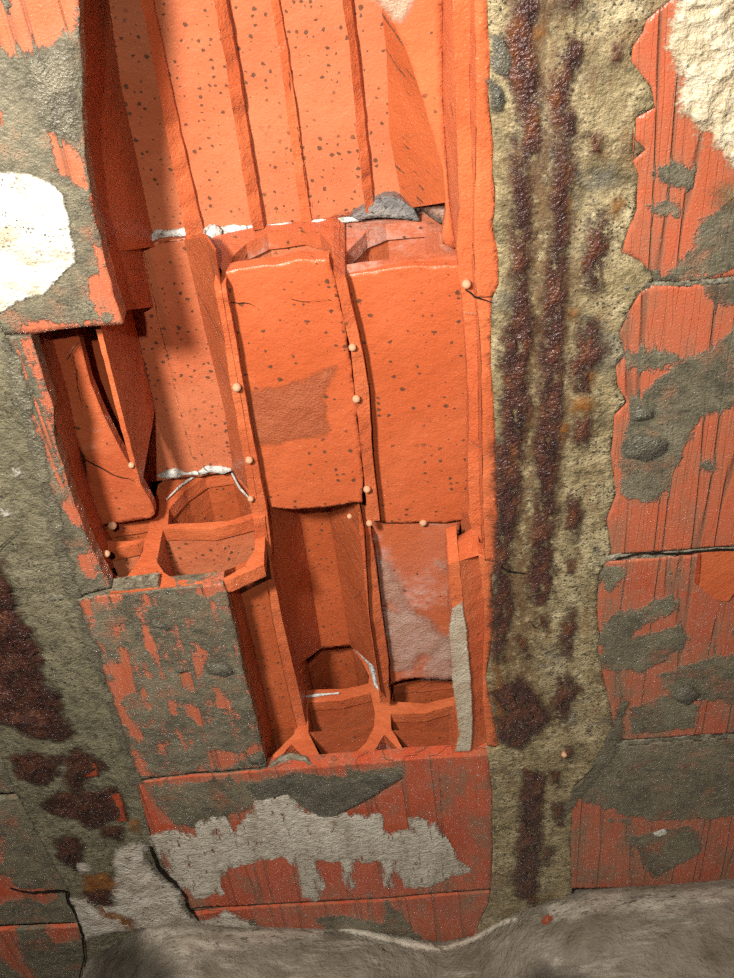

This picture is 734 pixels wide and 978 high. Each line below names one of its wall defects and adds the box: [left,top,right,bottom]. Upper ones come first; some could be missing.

spalling [23,40,81,142]
spalling [485,35,512,113]
leakage [665,0,734,167]
leakage [0,173,75,312]
corrosion [487,0,609,750]
crack [615,548,734,560]
spalling [694,551,734,601]
corrosion [0,559,72,742]
corrosion [10,747,138,841]
corrosion [52,835,133,929]
crack [149,846,200,922]
leakage [69,794,516,978]